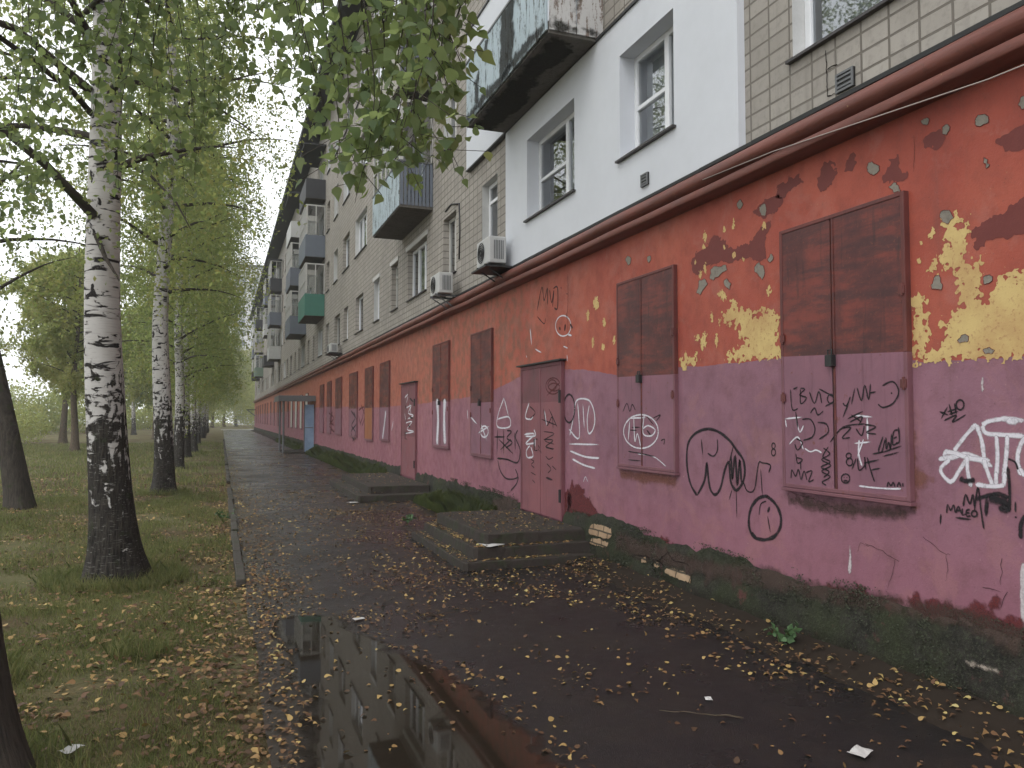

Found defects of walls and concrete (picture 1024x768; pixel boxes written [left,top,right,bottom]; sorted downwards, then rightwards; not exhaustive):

peeling [921,117,950,150]
spalling [975,114,990,127]
peeling [995,124,1024,152]
peeling [817,152,909,193]
peeling [679,174,804,371]
peeling [911,197,1024,368]
damp [617,533,1024,653]